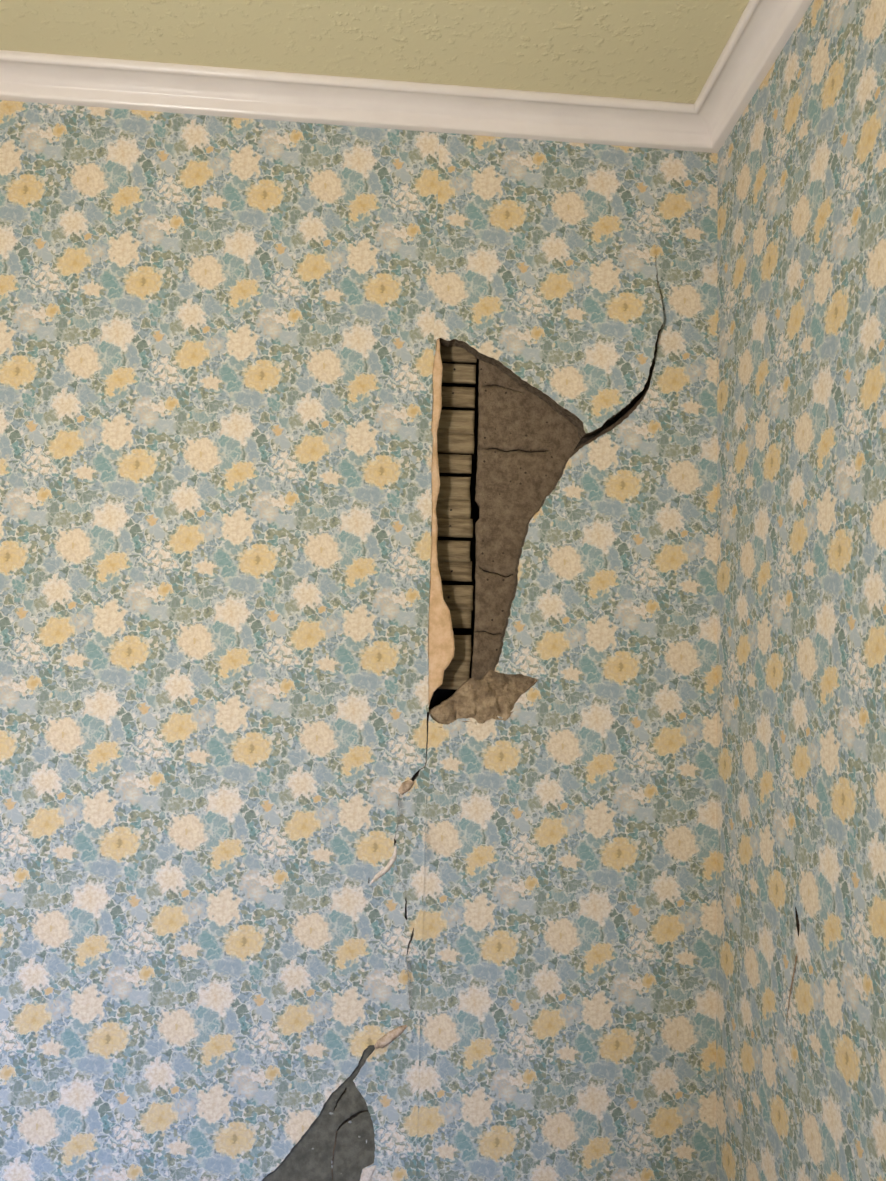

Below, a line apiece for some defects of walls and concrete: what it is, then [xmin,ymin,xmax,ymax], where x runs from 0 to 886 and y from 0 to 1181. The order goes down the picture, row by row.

crack [570,325,663,457]
flaking render [427,339,580,728]
flaking render [262,1045,375,1181]